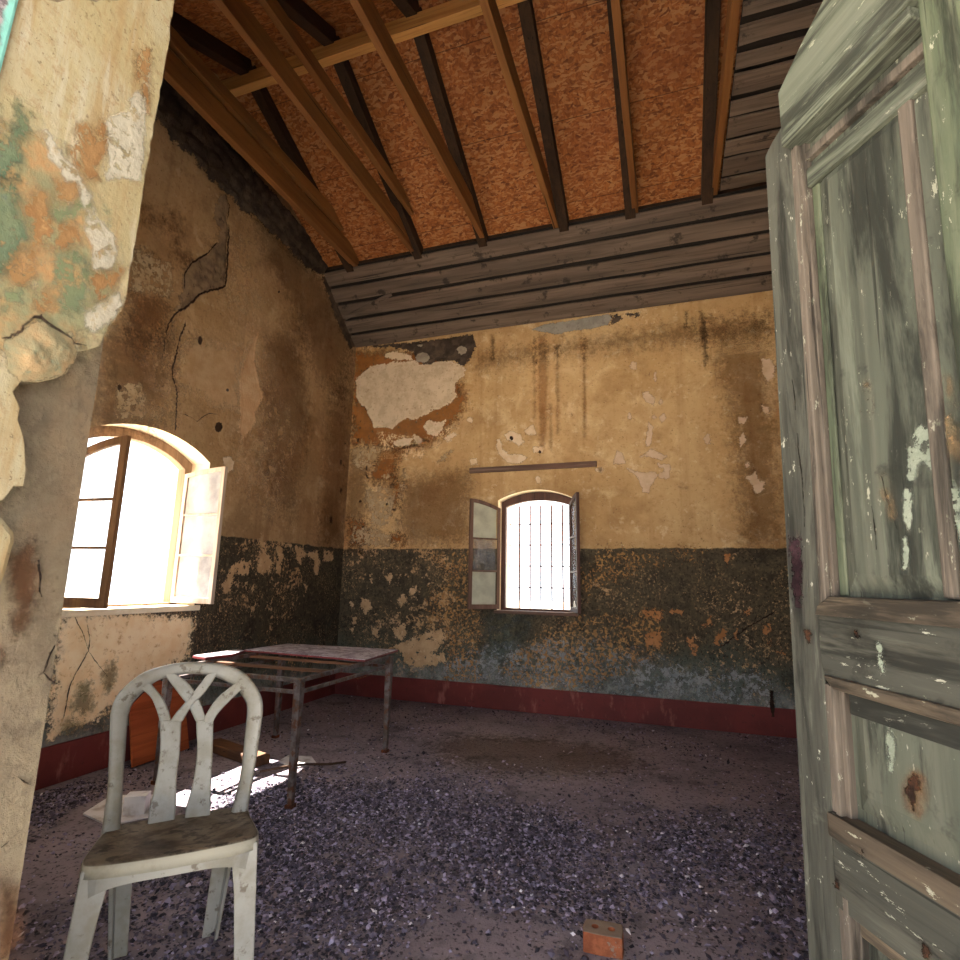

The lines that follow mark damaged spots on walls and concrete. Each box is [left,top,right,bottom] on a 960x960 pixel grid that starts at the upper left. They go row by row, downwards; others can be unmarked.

crack [2,314,87,346]
crack [164,194,230,430]
peeling [0,47,476,547]
peeling [761,358,775,382]
peeling [496,425,543,464]
peeling [596,391,671,493]
peeling [738,416,748,448]
peeling [944,415,959,456]
peeling [745,462,765,494]
crack [36,560,44,597]
crack [43,617,107,718]
damp [434,638,782,708]